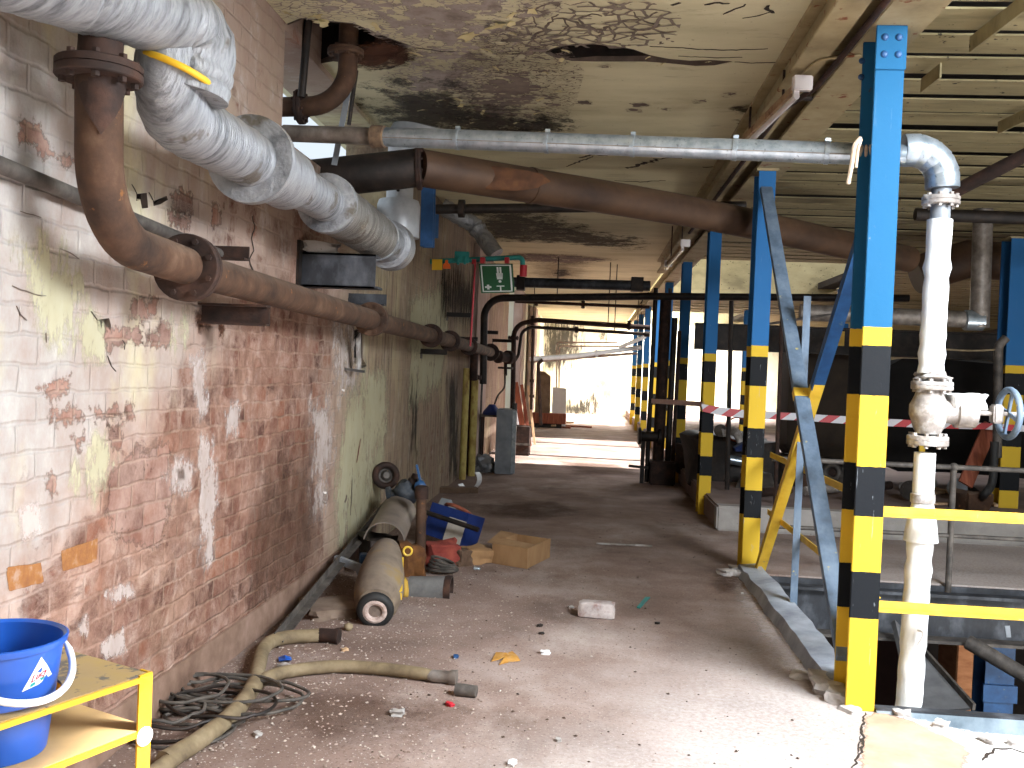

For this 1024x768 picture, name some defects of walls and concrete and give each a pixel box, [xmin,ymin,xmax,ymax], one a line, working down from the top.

peeling [269,0,593,129]
crack [505,2,775,66]
leakage [355,78,574,132]
peeling [18,118,74,168]
peeling [131,184,194,233]
leakage [473,213,647,276]
peeling [91,294,171,355]
efflorescence [193,356,209,414]
efflorescence [225,401,240,434]
peeling [35,373,172,550]
efflorescence [166,436,218,565]
crack [851,712,867,768]